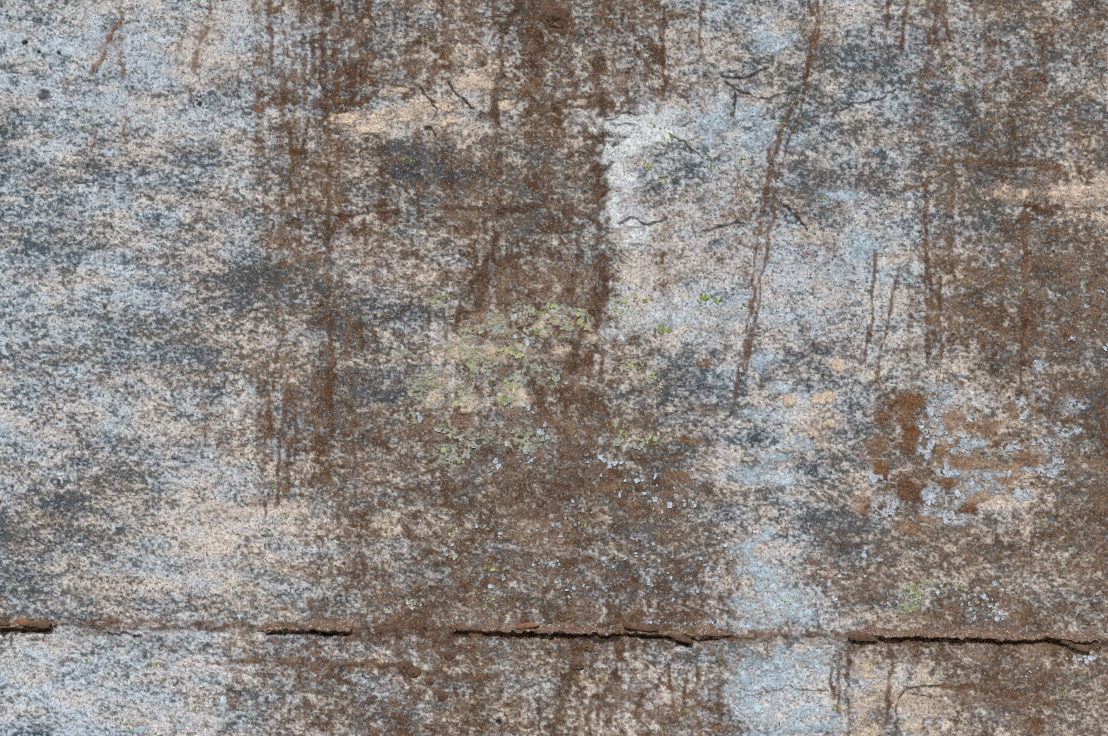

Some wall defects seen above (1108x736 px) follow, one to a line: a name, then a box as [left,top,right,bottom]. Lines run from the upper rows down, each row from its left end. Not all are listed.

water stain [210,0,743,736]
water stain [828,0,1108,736]
rust [863,393,928,501]
rust [937,409,1057,513]
crack [0,628,51,636]
crack [108,630,141,638]
crack [266,630,353,638]
crack [453,632,690,647]
crack [892,637,1067,646]